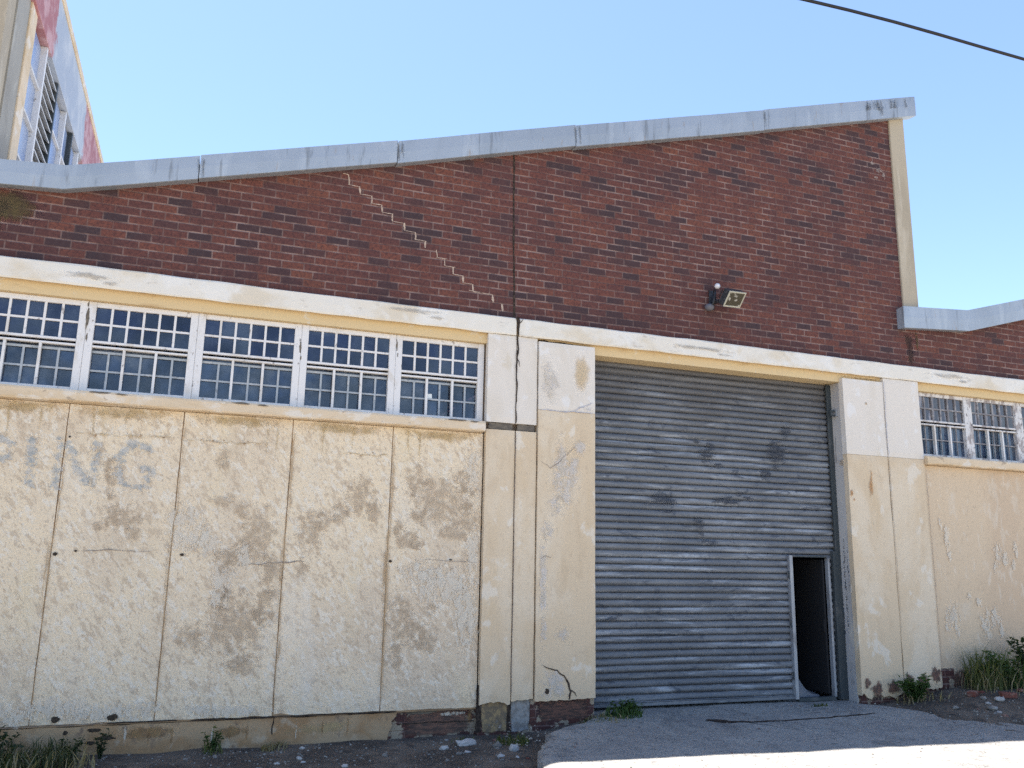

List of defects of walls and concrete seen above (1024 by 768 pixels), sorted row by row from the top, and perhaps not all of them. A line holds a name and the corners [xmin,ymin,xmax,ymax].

crack [343,155,592,503]
leakage [577,362,587,385]
crack [506,529,515,733]
crack [543,665,577,700]